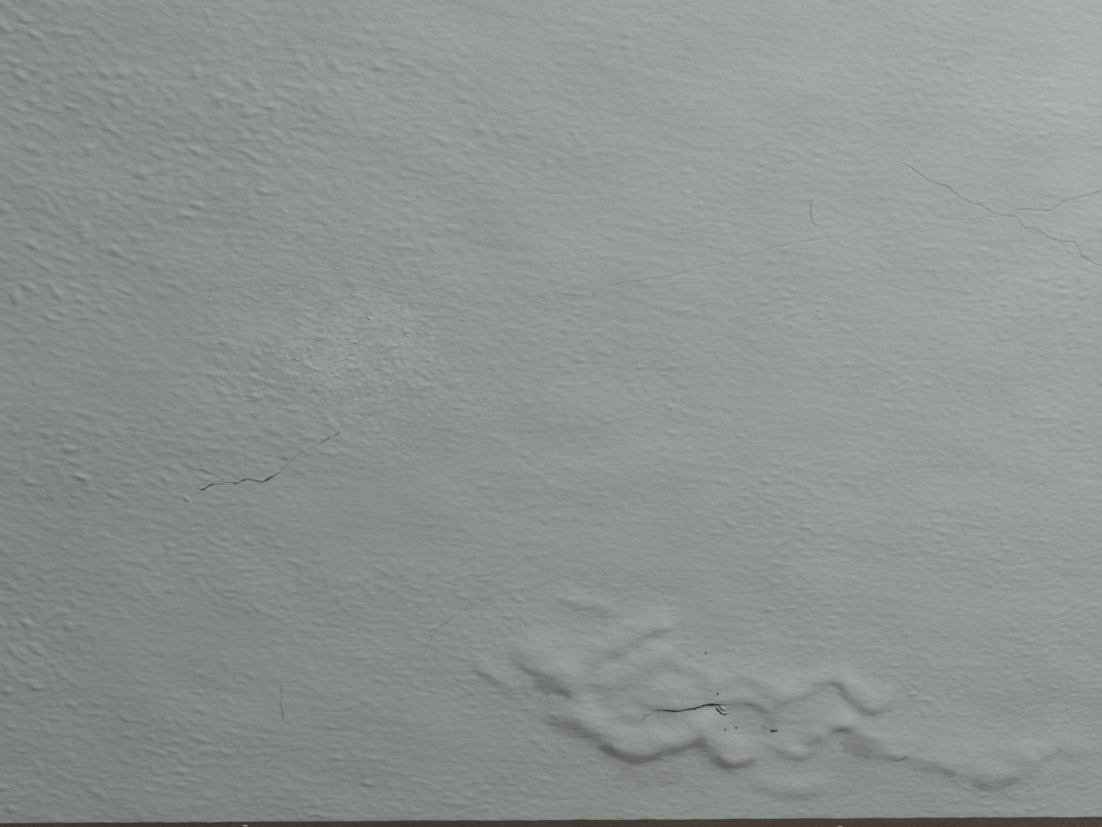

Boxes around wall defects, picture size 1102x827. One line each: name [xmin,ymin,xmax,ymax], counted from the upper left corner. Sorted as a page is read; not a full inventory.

crack [182,431,345,491]
crack [641,702,755,722]